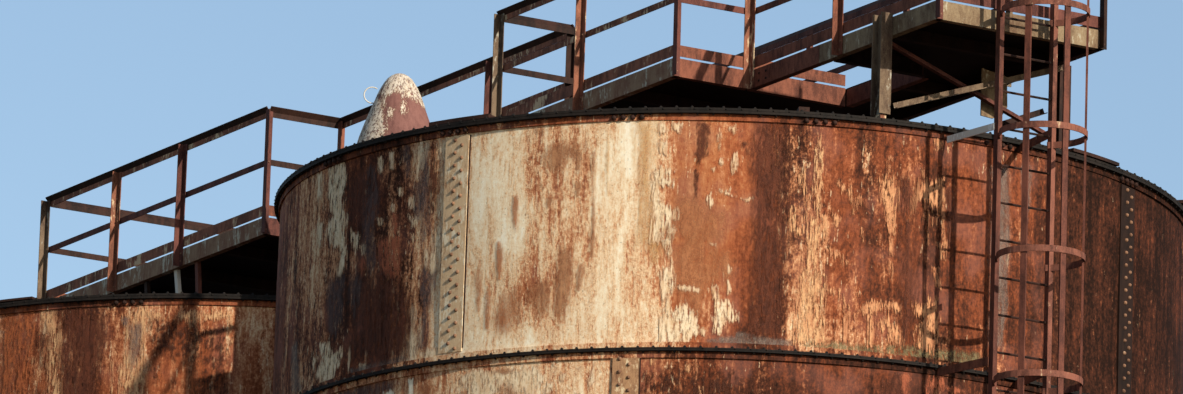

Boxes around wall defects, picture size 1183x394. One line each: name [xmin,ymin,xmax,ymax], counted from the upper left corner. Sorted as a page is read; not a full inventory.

peeling [357,73,426,143]
peeling [316,162,367,278]
peeling [377,139,446,278]
rust [476,204,595,328]
peeling [649,121,739,342]
peeling [789,133,948,355]
rust [0,314,45,394]
peeling [312,341,368,383]
peeling [406,305,445,361]
rust [901,373,910,394]
rust [925,376,960,394]